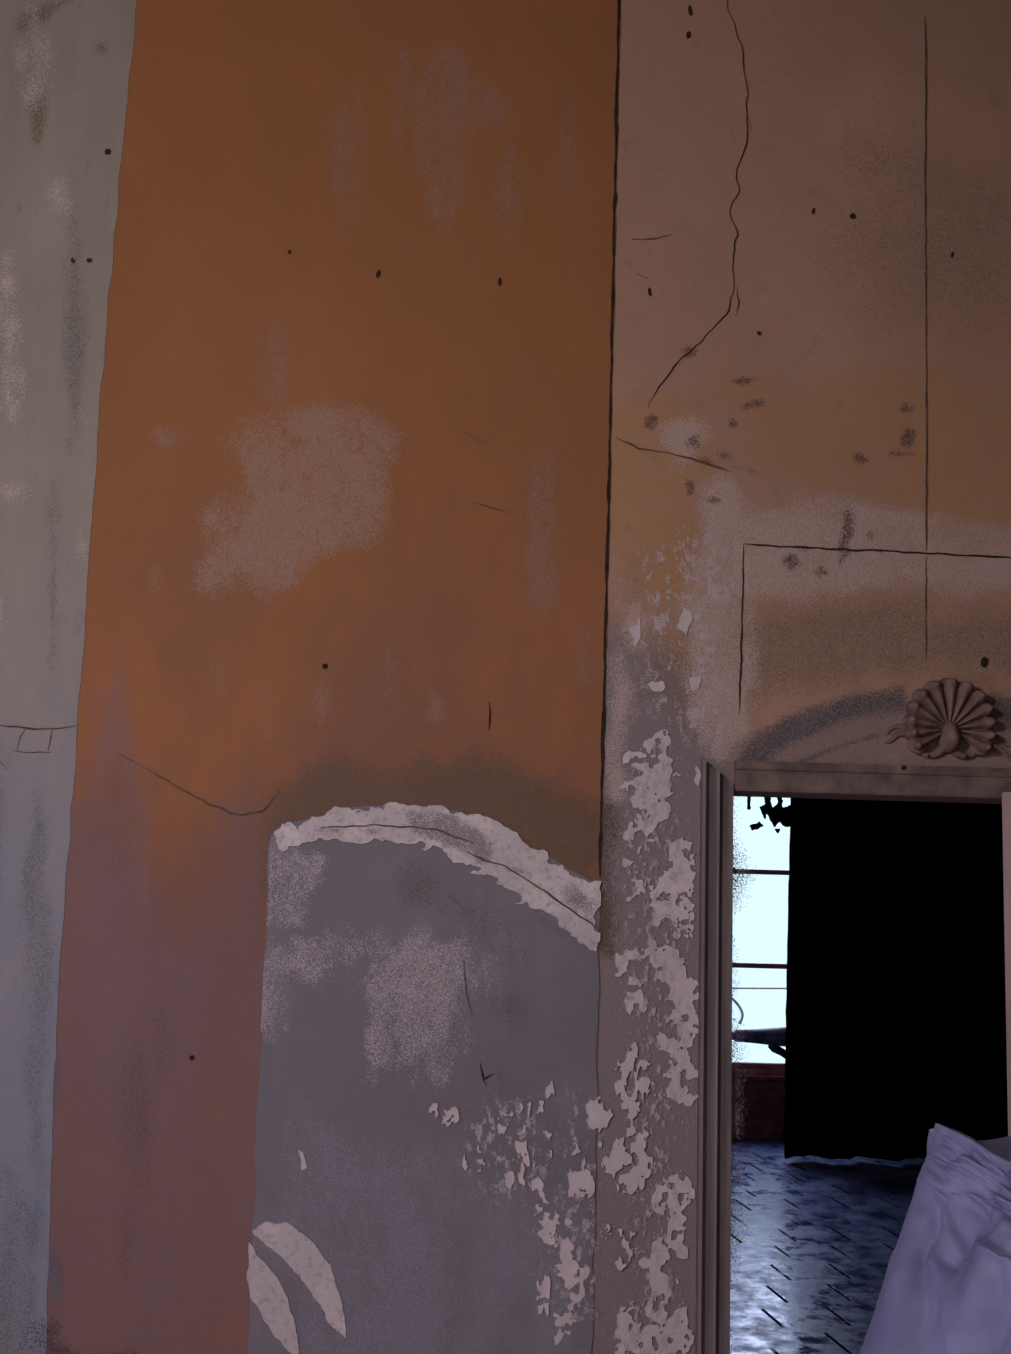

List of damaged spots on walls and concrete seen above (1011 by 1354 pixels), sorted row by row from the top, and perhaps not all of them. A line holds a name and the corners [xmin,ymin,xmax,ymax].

water stain [0,242,28,431]
water stain [184,310,404,608]
water stain [384,33,529,258]
crack [617,438,732,472]
crack [648,0,752,406]
crack [116,752,278,816]
water stain [0,399,1011,1354]
peeling [274,363,781,1354]